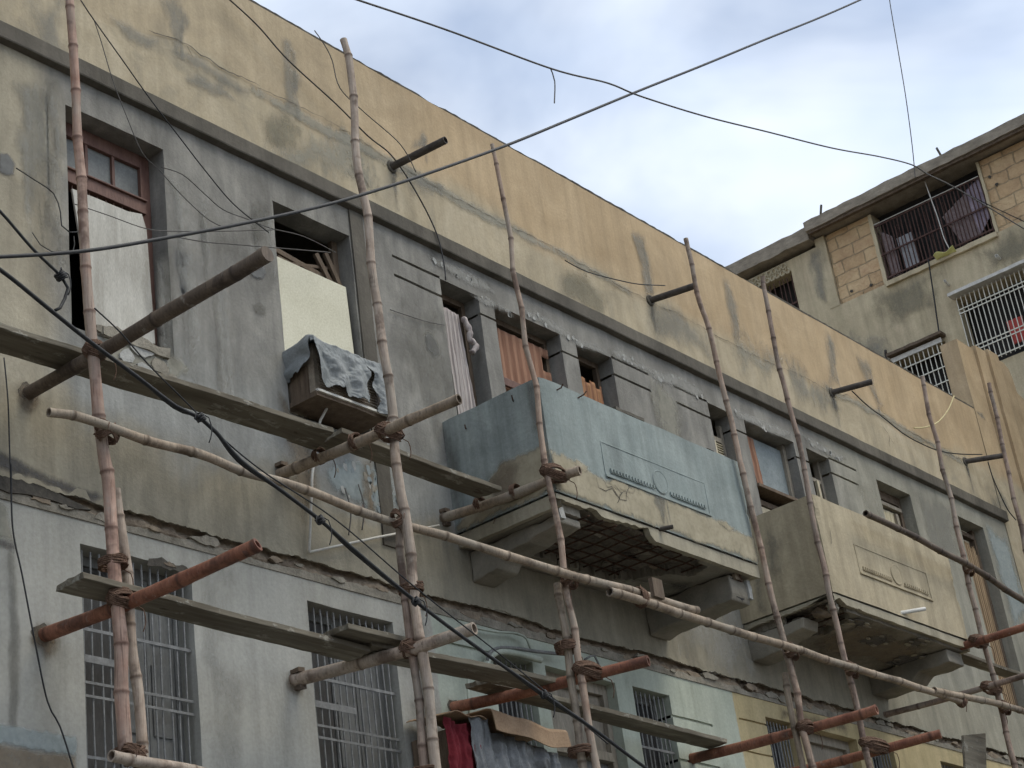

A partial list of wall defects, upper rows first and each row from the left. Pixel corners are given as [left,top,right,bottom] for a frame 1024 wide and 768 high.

flaking render [0,452,105,526]
flaking render [122,501,402,605]
peeling [329,461,381,513]
peeling [457,447,758,593]
flaking render [419,585,962,753]
flaking render [986,742,1024,768]